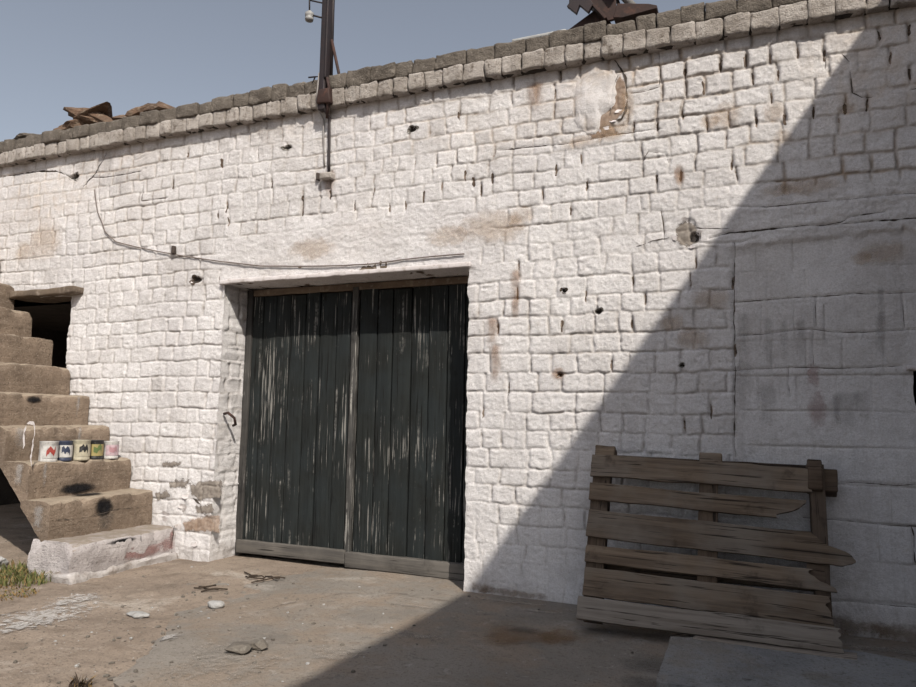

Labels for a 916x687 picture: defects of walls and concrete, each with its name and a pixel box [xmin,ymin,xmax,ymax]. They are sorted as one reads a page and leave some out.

spalling [636,217,728,248]
crack [711,197,916,454]
peeling [155,478,222,547]